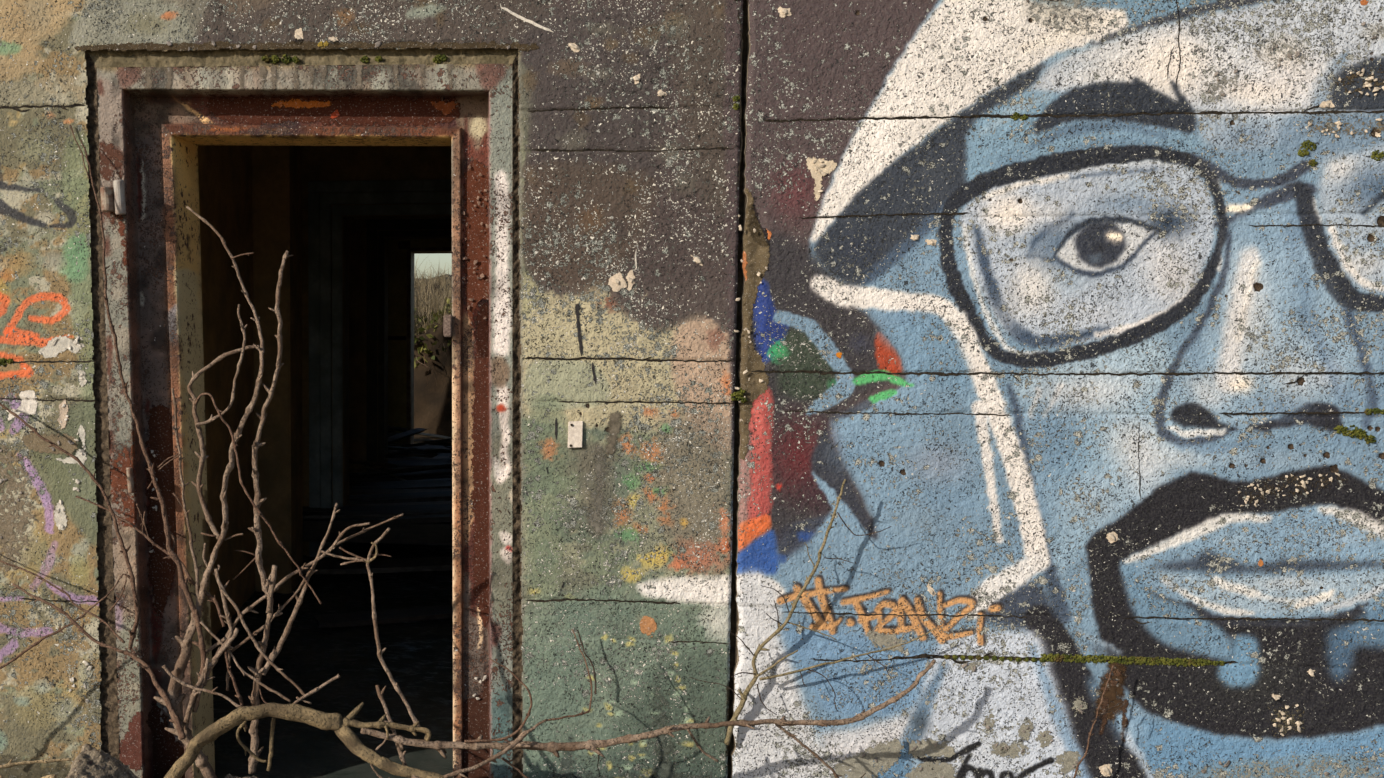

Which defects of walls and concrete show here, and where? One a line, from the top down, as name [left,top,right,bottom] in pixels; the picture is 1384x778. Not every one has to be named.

rust [206,91,461,127]
rust [99,140,124,187]
rust [103,202,130,285]
rust [461,159,490,627]
rust [110,404,177,618]
rust [119,702,185,778]
rust [463,675,490,778]